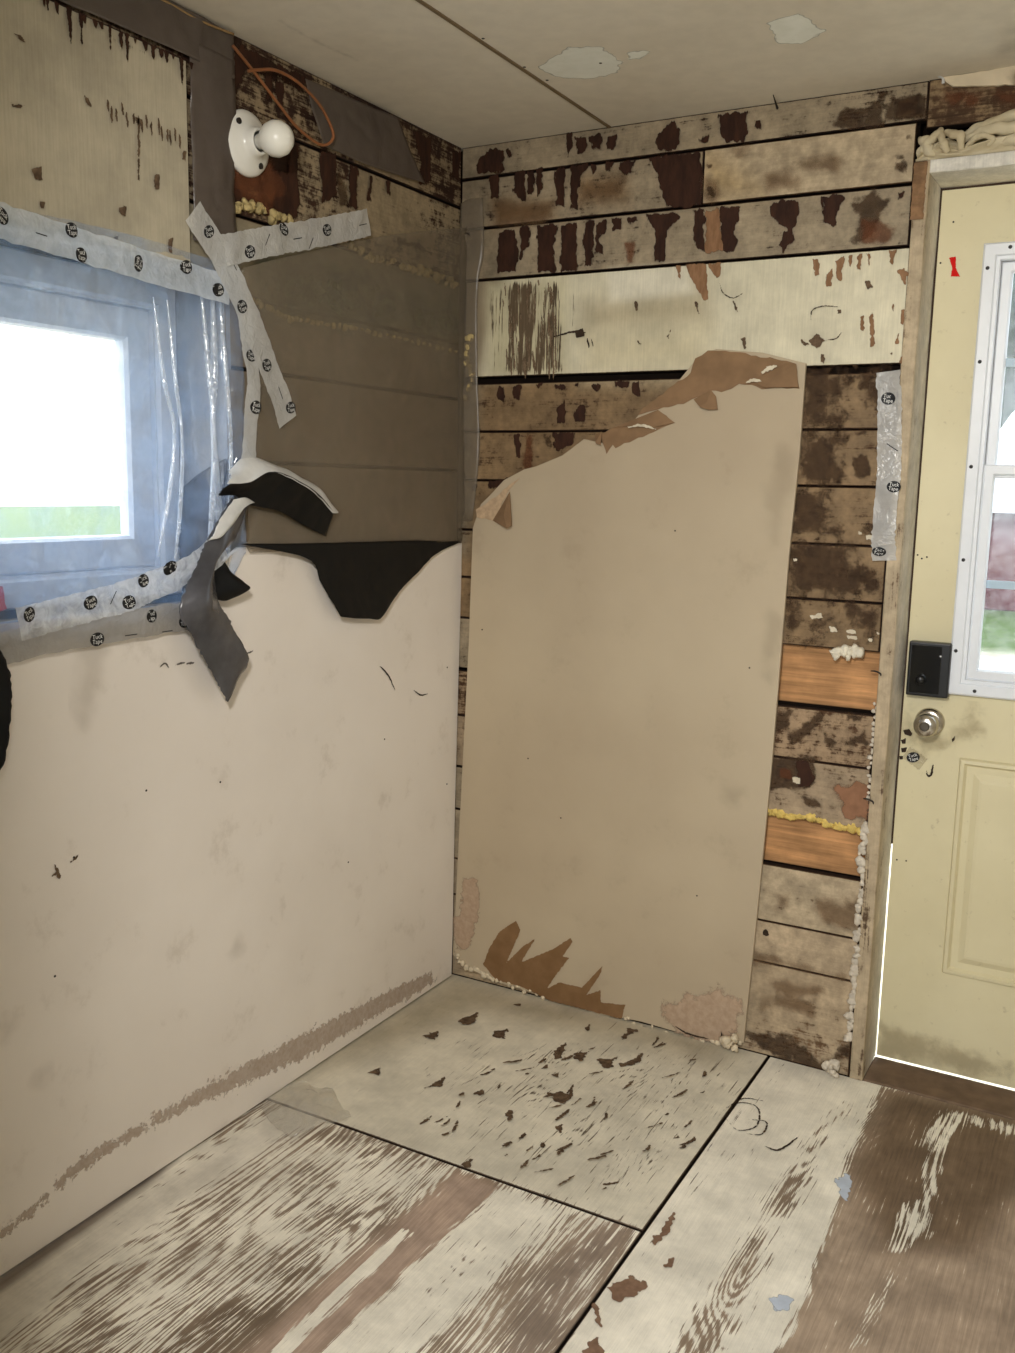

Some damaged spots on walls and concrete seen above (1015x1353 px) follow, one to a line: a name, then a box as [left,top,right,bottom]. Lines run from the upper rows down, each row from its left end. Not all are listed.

peeling [43,0,193,83]
peeling [234,44,305,107]
peeling [84,95,186,189]
peeling [271,144,300,218]
peeling [319,150,391,210]
peeling [770,199,799,253]
peeling [813,189,909,289]
peeling [452,111,761,469]
peeling [801,334,825,363]
peeling [860,314,875,347]
peeling [420,1016,668,1185]
peeling [726,1098,798,1151]